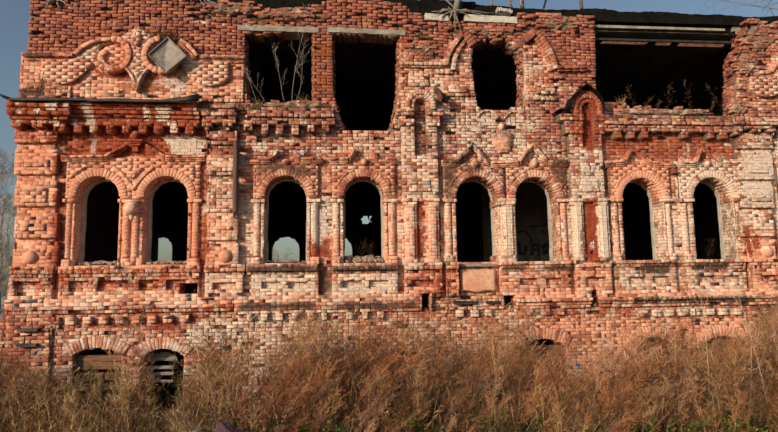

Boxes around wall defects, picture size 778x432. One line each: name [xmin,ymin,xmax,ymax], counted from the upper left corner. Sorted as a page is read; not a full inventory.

leakage [61,101,207,167]
peeling [307,199,332,258]
peeling [412,198,441,260]
peeling [573,163,611,259]